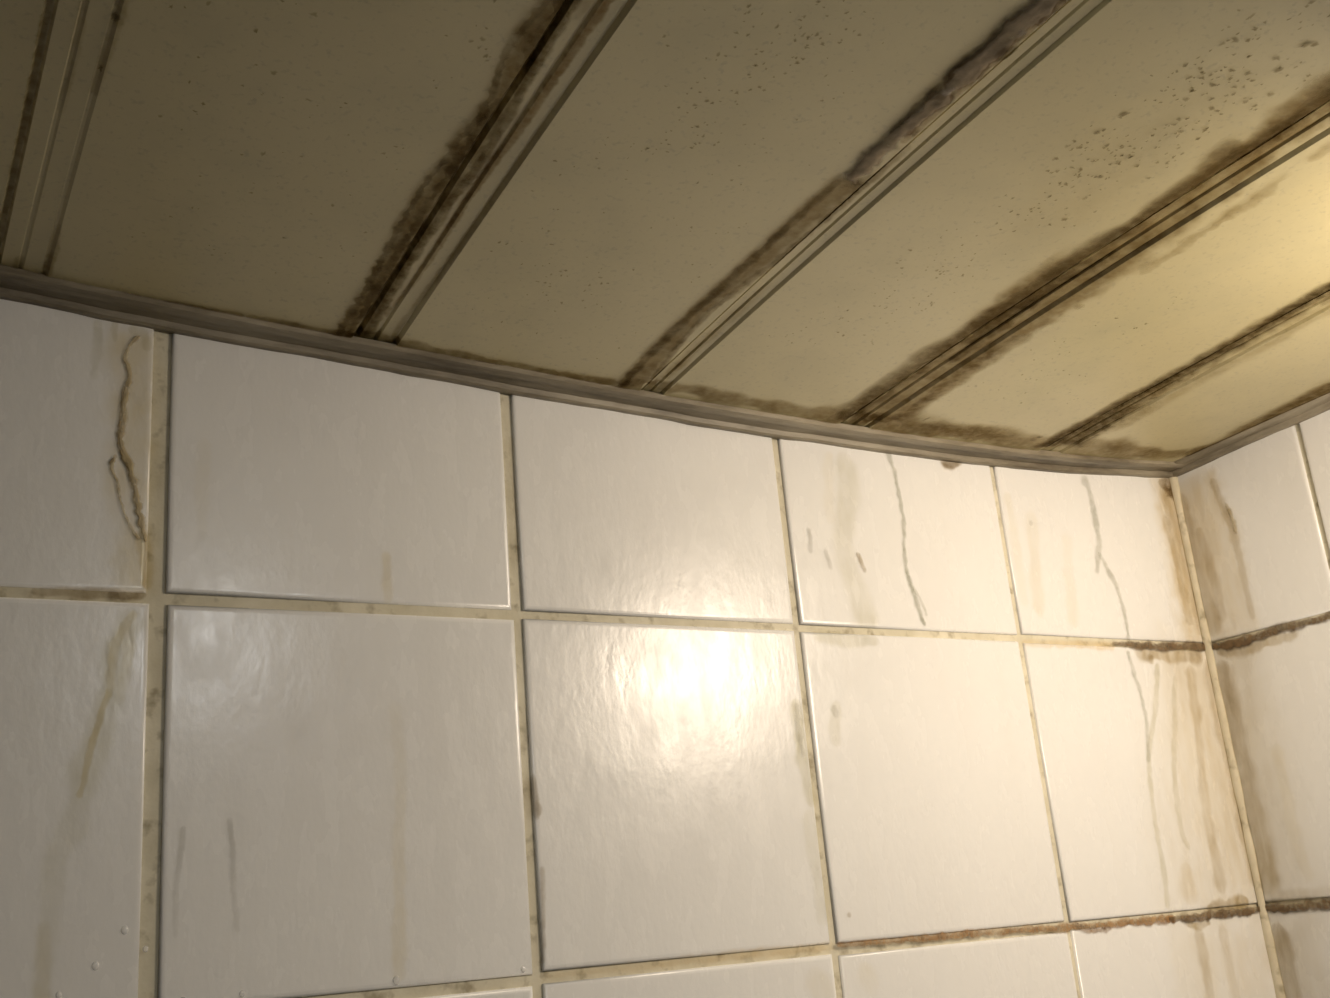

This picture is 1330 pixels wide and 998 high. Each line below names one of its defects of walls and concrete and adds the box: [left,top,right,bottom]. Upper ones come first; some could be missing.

water stain [441,0,578,223]
water stain [822,0,1065,223]
water stain [1056,290,1330,445]
corrosion [1114,612,1330,651]
corrosion [838,899,1330,947]